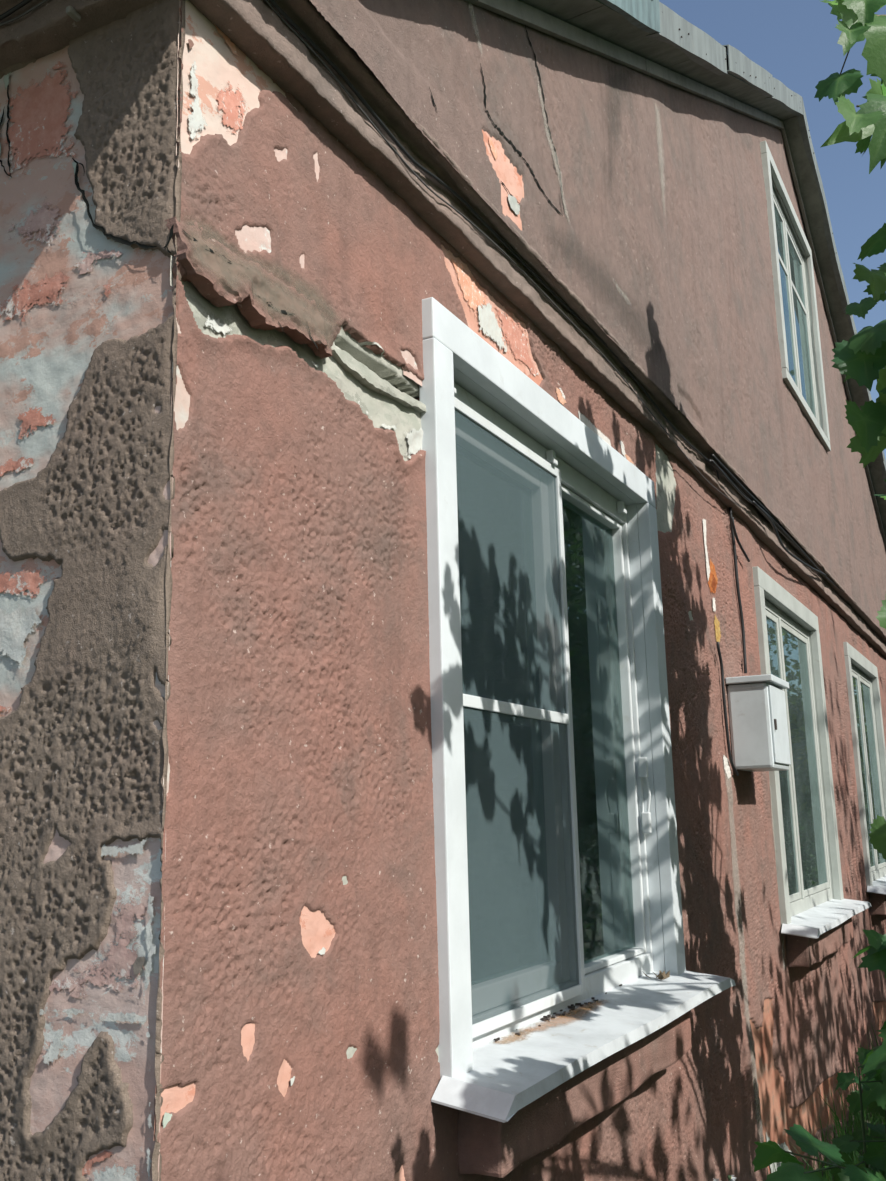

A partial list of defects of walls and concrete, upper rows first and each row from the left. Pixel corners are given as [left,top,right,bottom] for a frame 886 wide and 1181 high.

crack [72,158,174,253]
peeling [0,45,426,491]
peeling [176,0,297,167]
peeling [441,244,543,386]
peeling [482,130,524,231]
crack [480,25,567,230]
peeling [0,539,62,717]
peeling [148,530,171,566]
peeling [29,830,195,1181]
peeling [299,906,336,958]
corrosion [515,992,607,1036]
peeling [749,998,853,1174]